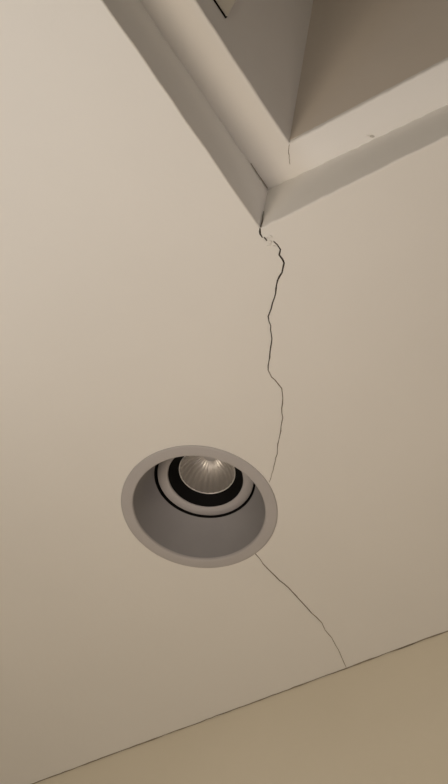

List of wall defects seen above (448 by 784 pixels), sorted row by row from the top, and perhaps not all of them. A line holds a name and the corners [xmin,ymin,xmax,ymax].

crack [259,211,285,482]